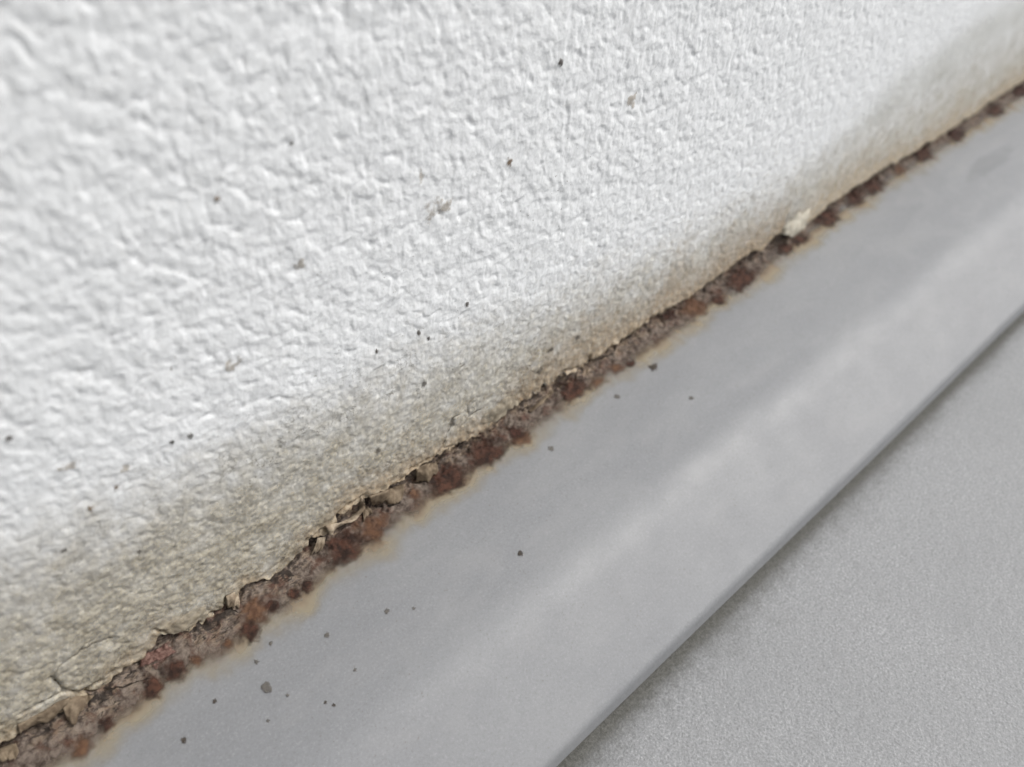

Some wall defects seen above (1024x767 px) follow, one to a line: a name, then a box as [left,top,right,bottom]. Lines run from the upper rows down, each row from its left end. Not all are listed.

rust [807,75,1024,227]
rust [0,214,835,767]
peeling [311,496,372,555]
peeling [226,592,240,609]
peeling [0,695,94,762]